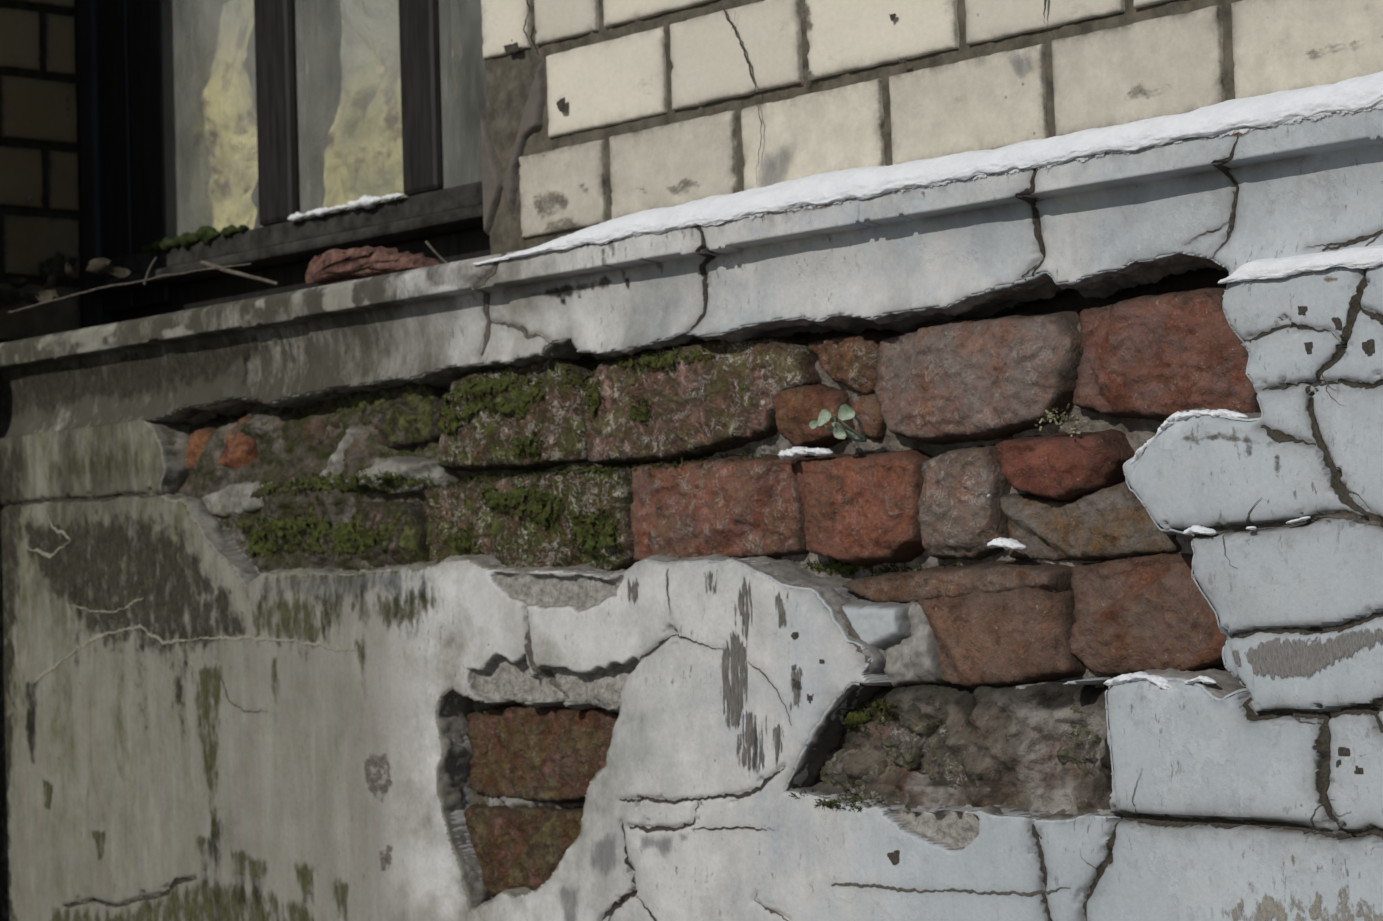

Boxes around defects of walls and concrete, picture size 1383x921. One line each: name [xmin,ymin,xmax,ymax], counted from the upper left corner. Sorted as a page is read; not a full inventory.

crack [473,253,549,356]
crack [683,226,715,334]
crack [1015,168,1045,277]
crack [1186,135,1238,259]
crack [1194,229,1383,568]
water stain [0,449,434,921]
spalling [144,252,1383,850]
crack [837,594,867,662]
crack [1230,612,1383,638]
spalling [435,655,639,912]
crack [602,765,788,921]
crack [831,695,1383,921]